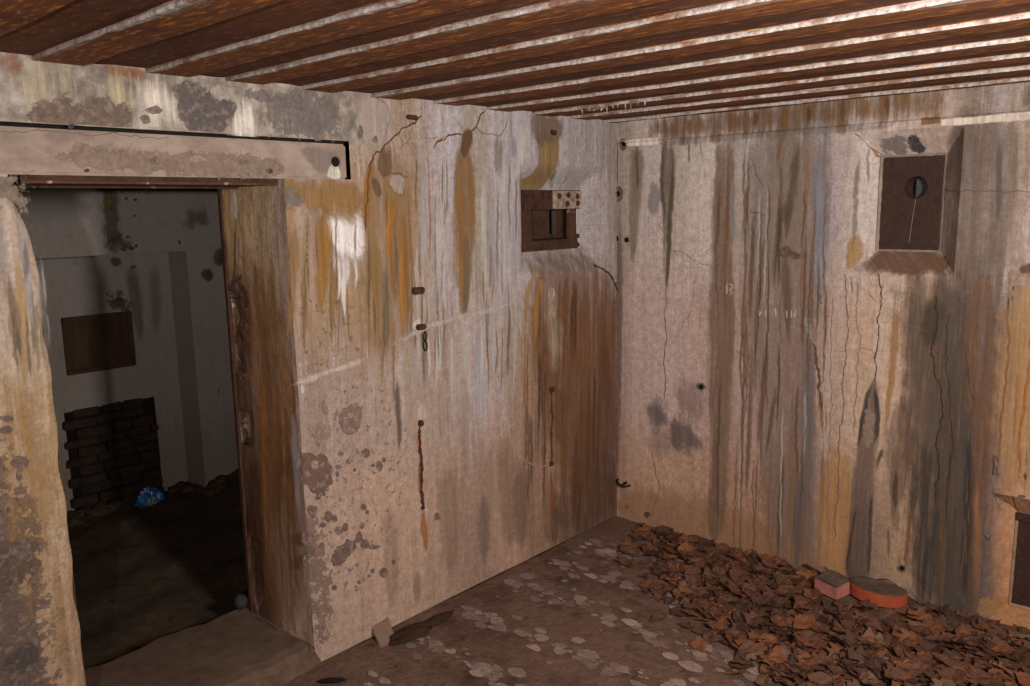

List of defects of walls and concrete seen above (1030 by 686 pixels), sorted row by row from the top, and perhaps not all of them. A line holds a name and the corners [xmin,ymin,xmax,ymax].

spalling [26,91,163,129]
spalling [56,142,285,180]
corrosion [228,274,250,382]
peeling [173,81,341,141]
damp [326,213,364,315]
crack [365,95,508,231]
corrosion [453,130,474,314]
corrosion [520,115,562,190]
damp [617,139,703,399]
damp [709,130,829,567]
corrosion [417,427,427,548]
damp [846,271,1030,630]